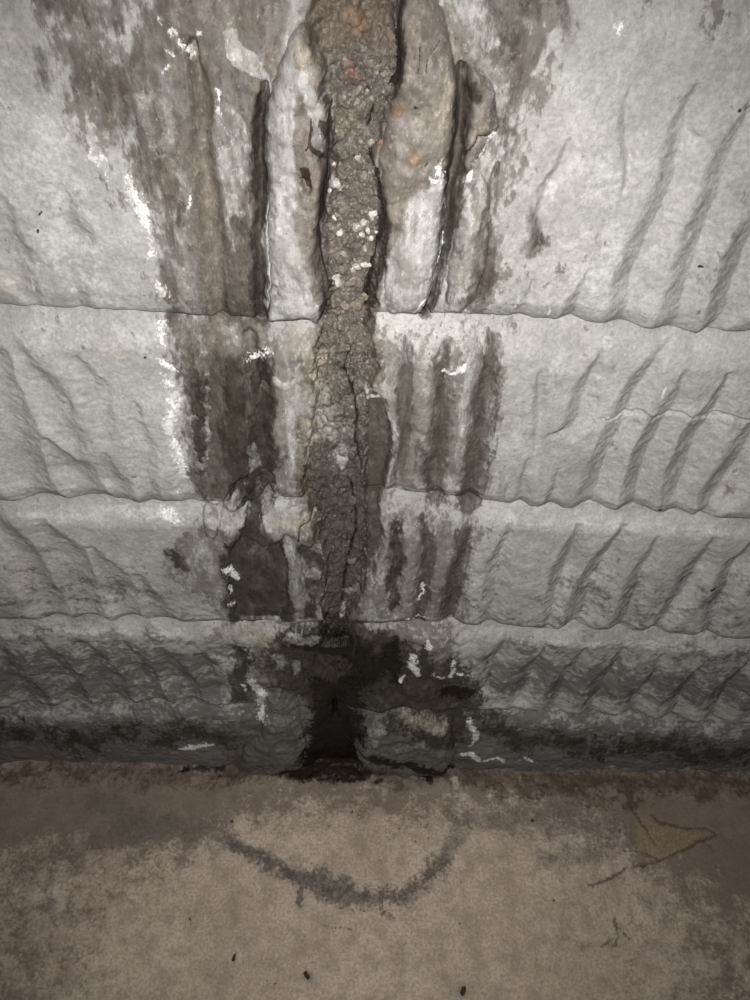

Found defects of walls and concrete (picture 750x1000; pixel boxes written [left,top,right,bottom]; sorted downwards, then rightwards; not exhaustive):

leakage [37,0,123,35]
crack [305,99,334,287]
crack [364,0,440,305]
crack [321,345,359,656]
leakage [69,0,750,827]
leakage [0,718,249,789]